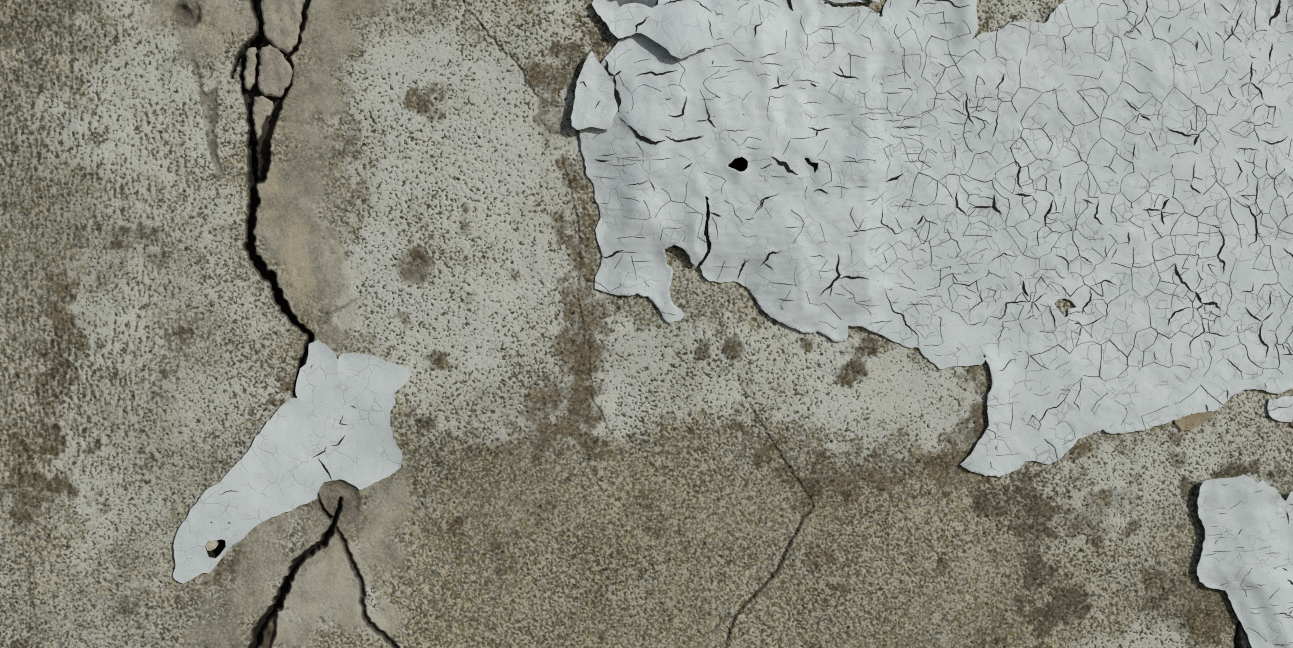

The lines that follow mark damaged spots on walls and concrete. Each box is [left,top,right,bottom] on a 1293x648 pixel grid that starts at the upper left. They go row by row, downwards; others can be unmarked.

crack [243,135,315,397]
spalling [728,157,748,172]
peeling [871,0,1293,477]
peeling [173,340,412,584]
crack [247,493,400,648]
crack [725,505,815,648]
peeling [1196,474,1293,648]